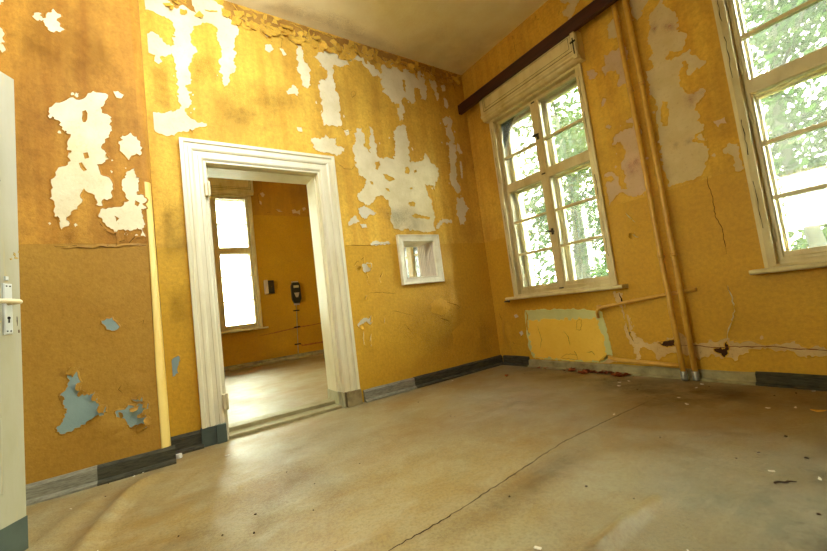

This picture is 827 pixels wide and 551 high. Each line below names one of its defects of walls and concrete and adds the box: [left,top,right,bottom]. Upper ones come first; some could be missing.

peeling [0,21,8,54]
peeling [30,7,67,34]
peeling [585,13,630,88]
peeling [144,0,470,233]
peeling [628,0,745,188]
peeling [46,90,149,238]
peeling [603,115,651,207]
spalling [657,339,675,354]
spalling [713,341,730,359]
crack [681,286,827,351]
peeling [54,366,152,436]